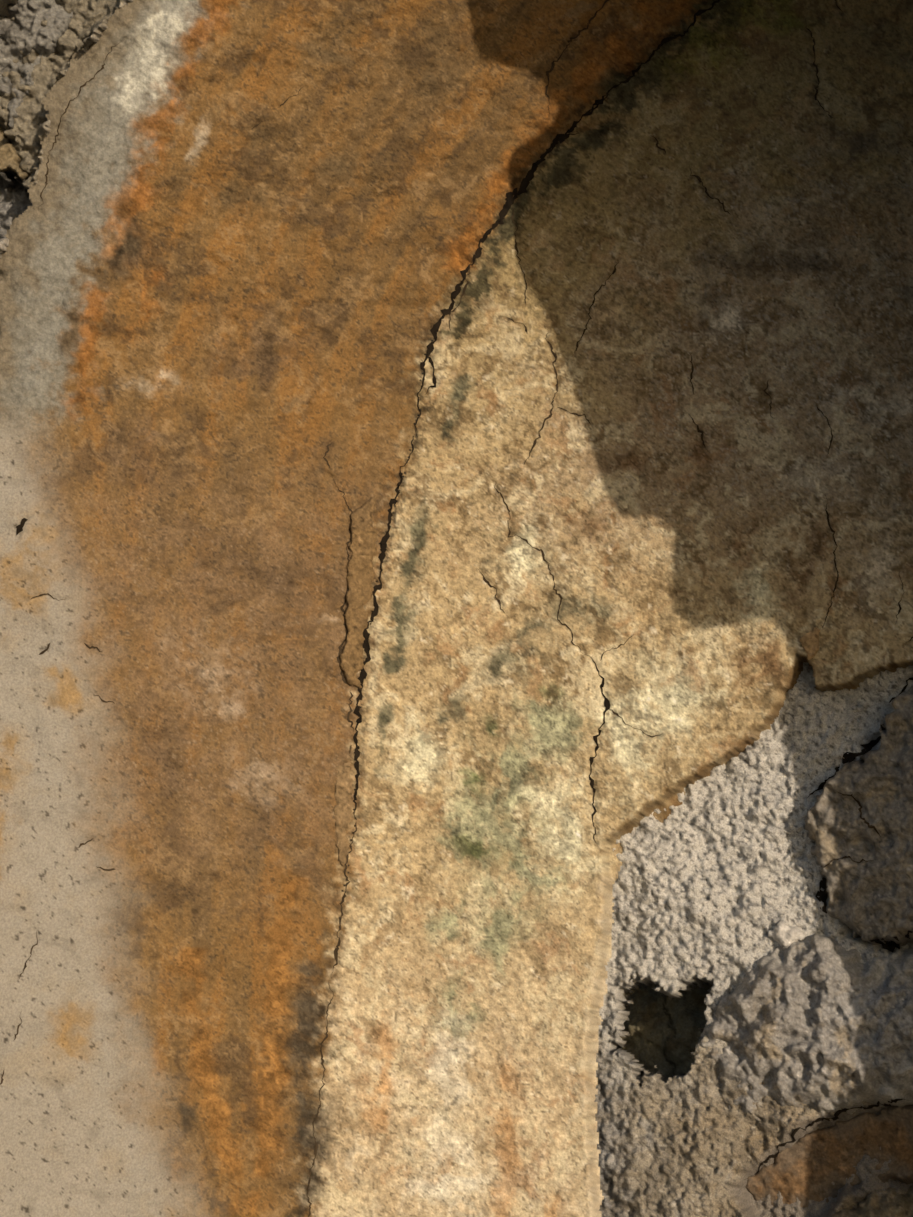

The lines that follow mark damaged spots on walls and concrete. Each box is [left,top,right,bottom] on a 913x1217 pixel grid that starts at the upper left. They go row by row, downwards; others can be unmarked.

rust [0,483,110,880]
crack [307,0,730,1217]
crack [807,677,913,914]
crack [896,571,913,642]
rust [36,980,110,1089]
flaking render [594,627,913,1217]
crack [870,931,913,952]